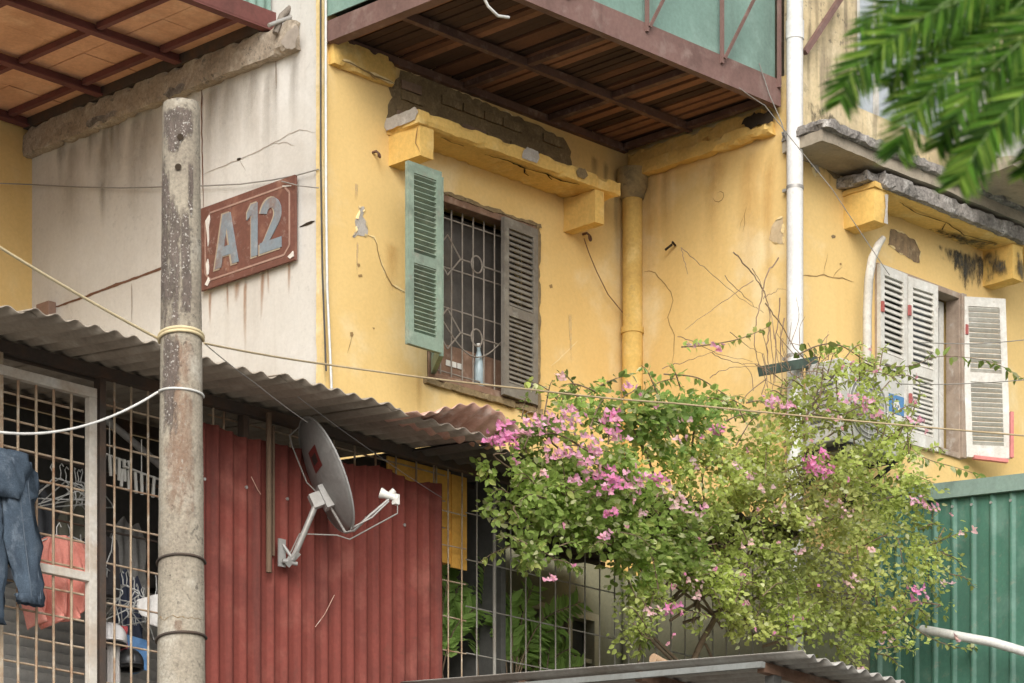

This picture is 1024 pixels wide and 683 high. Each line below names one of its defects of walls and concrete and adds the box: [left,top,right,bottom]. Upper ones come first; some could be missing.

crack [201,90,315,208]
spalling [384,70,588,179]
crack [489,155,576,184]
spalling [353,206,368,238]
spalling [884,194,921,263]
damp [938,230,1023,288]
crack [644,271,675,361]